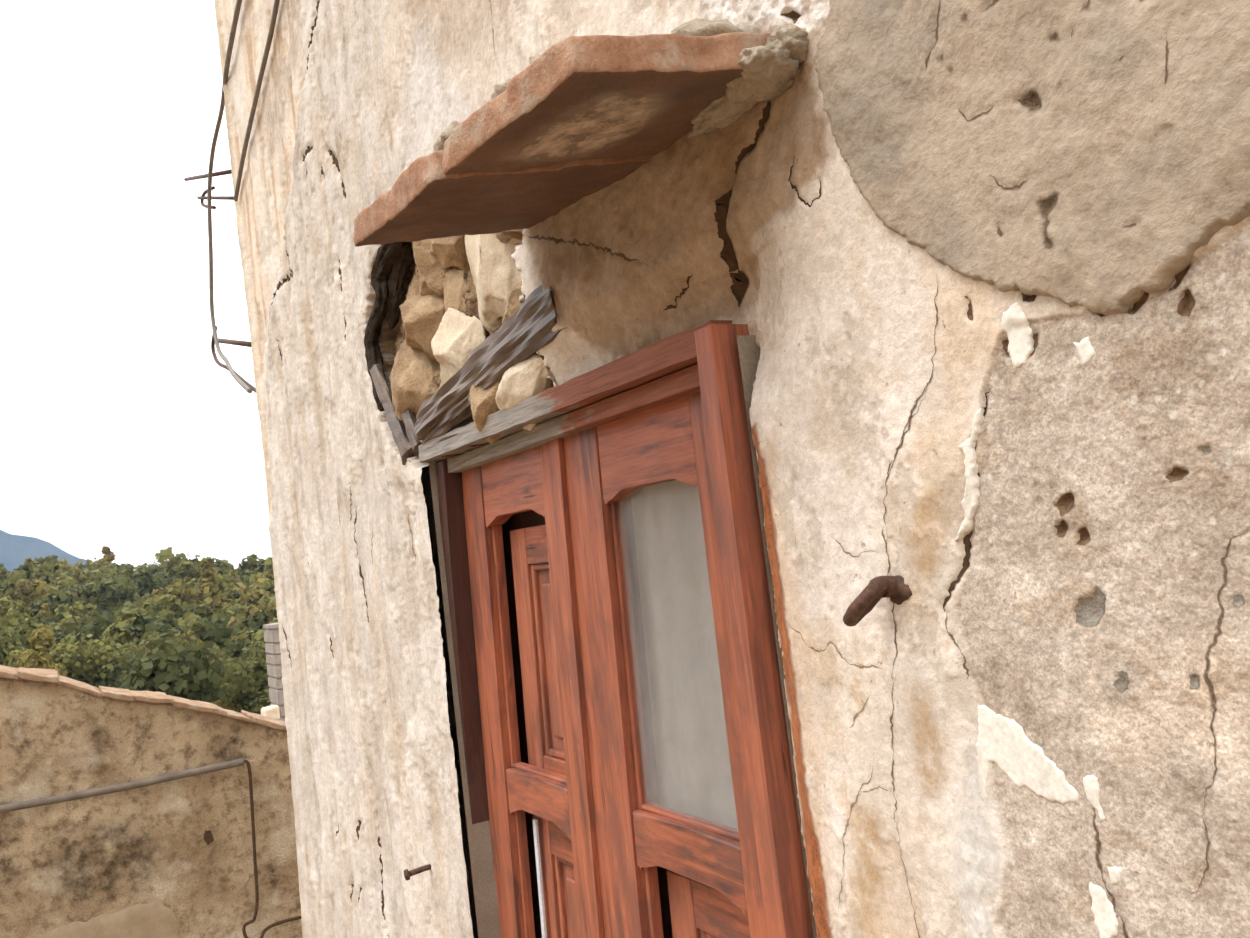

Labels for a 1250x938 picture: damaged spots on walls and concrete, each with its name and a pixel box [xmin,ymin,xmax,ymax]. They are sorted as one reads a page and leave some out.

crack [714,100,771,307]
crack [269,237,293,310]
peeling [364,242,420,414]
hole [1054,493,1090,546]
crack [790,284,938,938]
crack [943,530,973,679]
hole [1074,586,1105,627]
peeling [976,705,1105,823]
crack [1191,529,1249,894]
water stain [64,830,147,889]
peeling [1089,866,1122,938]
crack [1092,809,1128,938]